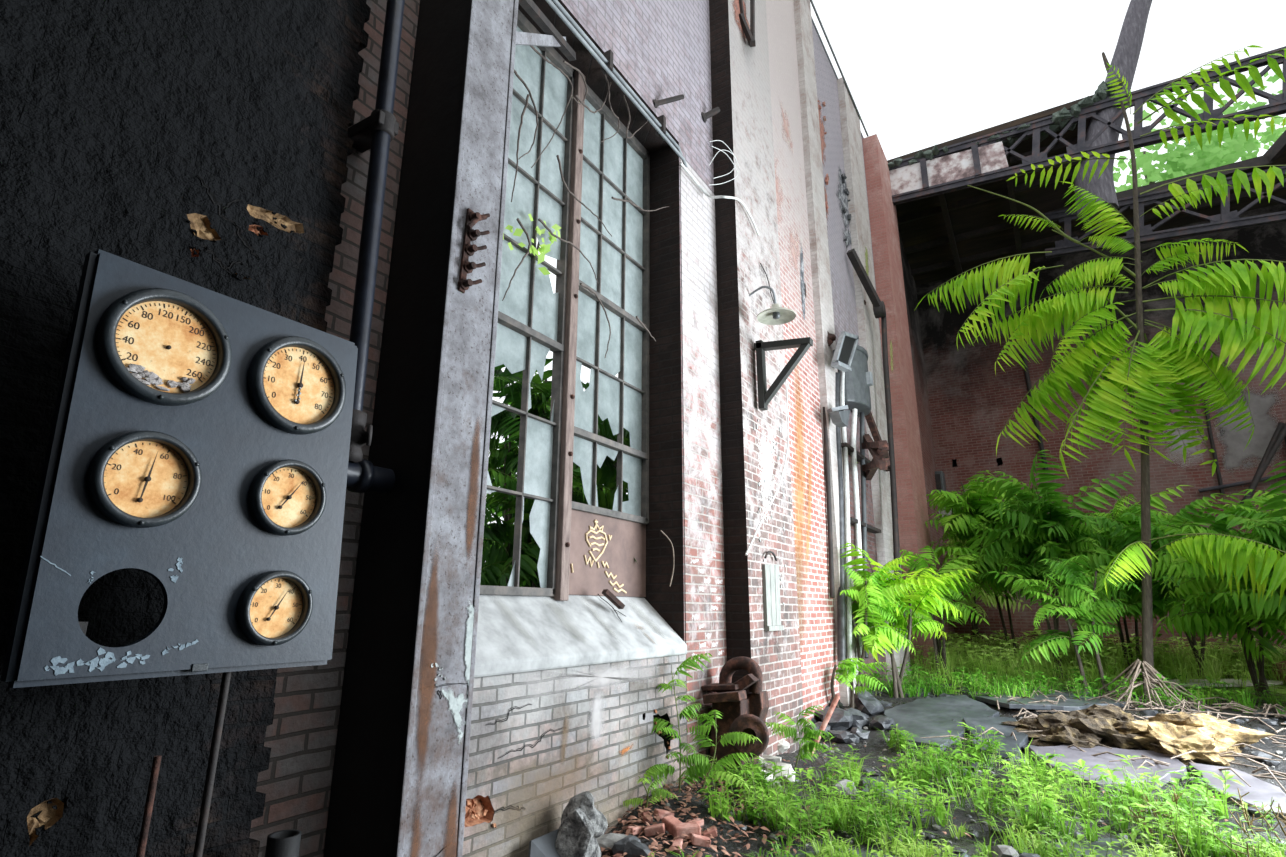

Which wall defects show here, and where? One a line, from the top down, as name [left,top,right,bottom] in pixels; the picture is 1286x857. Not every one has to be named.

spalling [187,213,222,257]
spalling [247,204,304,237]
rust [467,428,479,554]
rust [418,561,438,766]
spalling [27,797,74,846]
rust [411,809,420,857]
rust [445,793,457,857]
spalling [464,795,496,828]